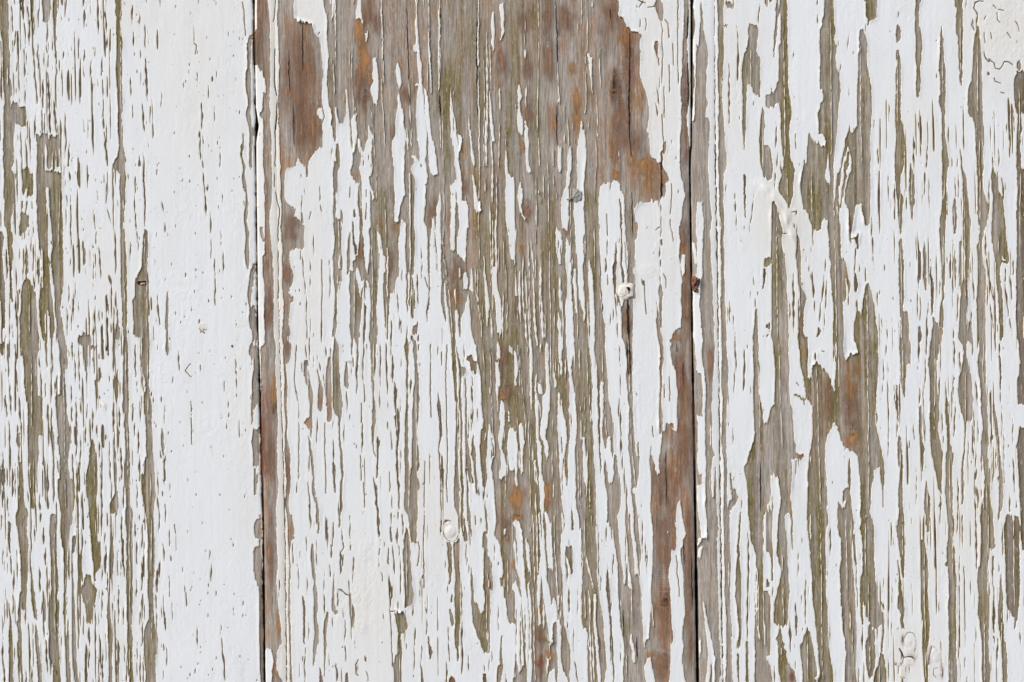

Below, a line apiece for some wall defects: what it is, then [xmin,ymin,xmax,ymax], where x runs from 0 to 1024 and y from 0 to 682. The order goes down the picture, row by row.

peeling [0,0,165,682]
peeling [240,0,887,682]
peeling [896,436,906,629]
peeling [895,25,915,397]
peeling [899,0,1021,682]